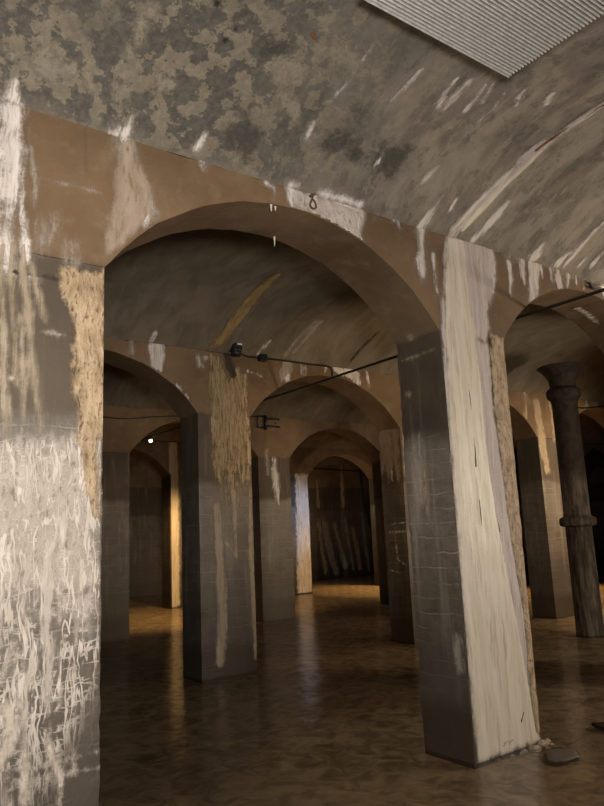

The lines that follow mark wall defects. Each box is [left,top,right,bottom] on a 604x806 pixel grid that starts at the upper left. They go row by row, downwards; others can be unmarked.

damp [435,77,472,111]
damp [463,84,493,113]
damp [193,133,207,151]
damp [448,101,604,243]
damp [416,201,439,278]
damp [506,221,604,302]
spalling [59,266,104,517]
damp [0,78,101,806]